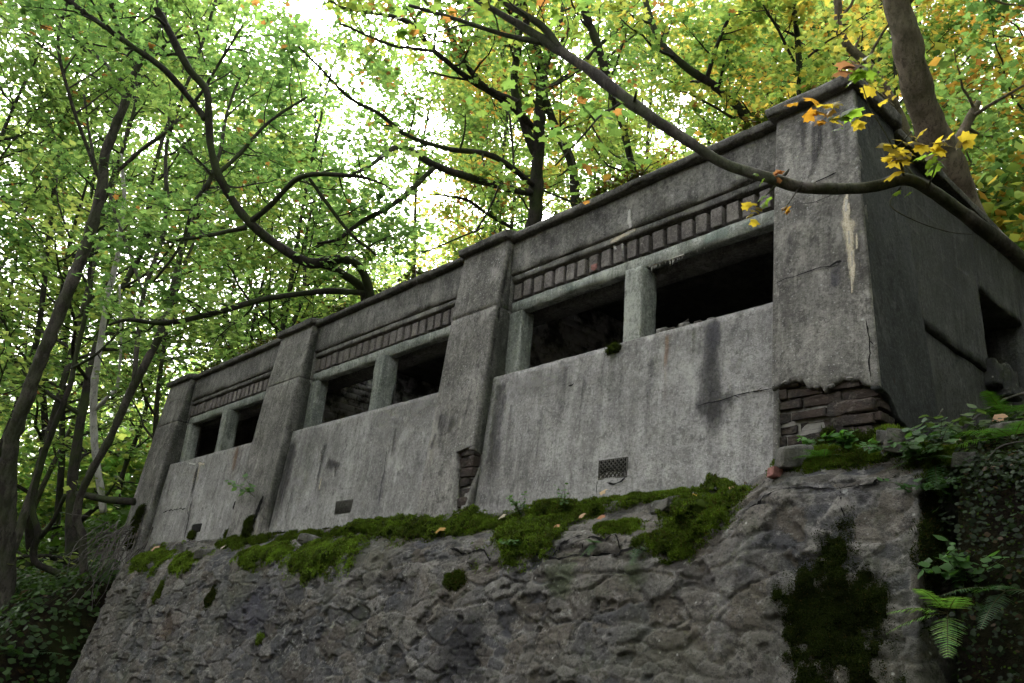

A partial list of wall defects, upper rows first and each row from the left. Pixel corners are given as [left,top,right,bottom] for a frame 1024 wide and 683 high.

water stain [833,194,858,293]
water stain [697,338,729,418]
spalling [773,376,895,447]
crack [866,321,874,382]
spalling [457,448,481,509]